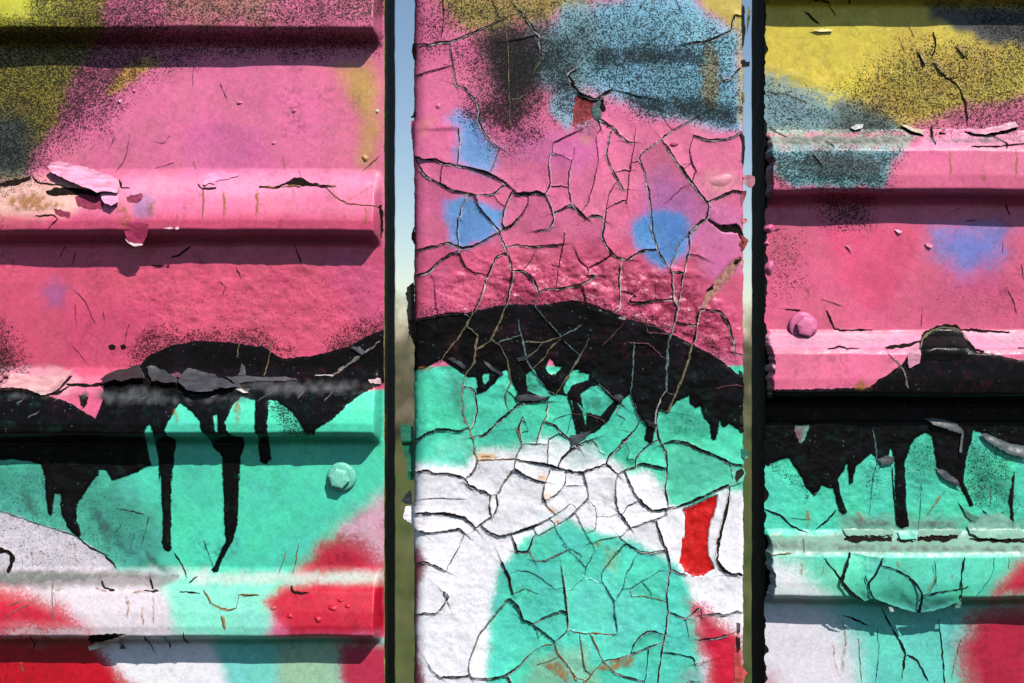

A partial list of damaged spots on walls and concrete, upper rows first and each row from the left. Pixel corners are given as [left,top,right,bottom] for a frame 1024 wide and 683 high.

crack [898,26,1024,148]
peeling [0,175,31,187]
peeling [46,161,143,218]
crack [259,171,378,206]
peeling [121,222,149,246]
peeling [699,133,755,311]
crack [409,0,743,683]
peeling [100,363,296,394]
peeling [925,418,964,453]
peeling [981,433,1024,458]
peeling [935,468,961,488]
crack [764,428,1024,683]